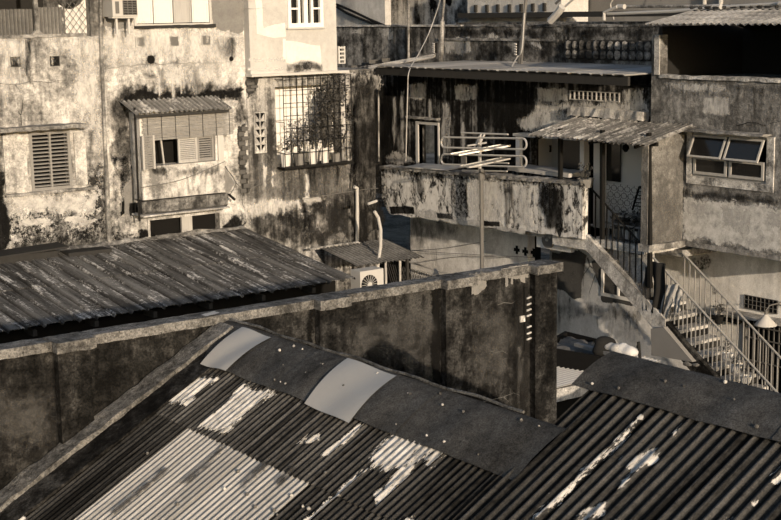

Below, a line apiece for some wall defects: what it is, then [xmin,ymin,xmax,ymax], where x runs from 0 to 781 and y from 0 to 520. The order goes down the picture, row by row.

damp [0,39,37,80]
damp [414,3,429,54]
damp [444,0,644,62]
damp [223,71,563,251]
damp [0,172,158,250]
peeling [169,377,219,407]
peeling [197,384,279,433]
peeling [303,434,443,520]
peeling [531,414,659,520]